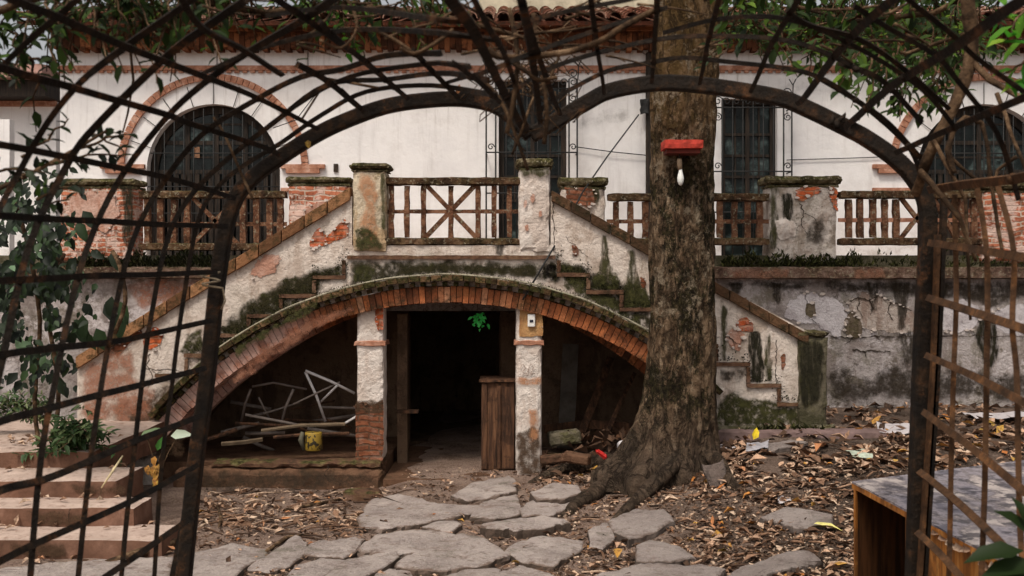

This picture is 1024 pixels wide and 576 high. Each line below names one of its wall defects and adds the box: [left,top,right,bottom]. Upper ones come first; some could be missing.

flaking render [63,189,120,233]
flaking render [309,218,350,251]
leakage [351,173,559,285]
flaking render [795,185,839,212]
flaking render [725,317,753,351]
leakage [748,331,764,382]
leakage [756,281,804,303]
flaking render [784,290,914,339]
leakage [799,280,916,407]
leakage [939,318,1024,400]
leakage [944,282,1024,307]